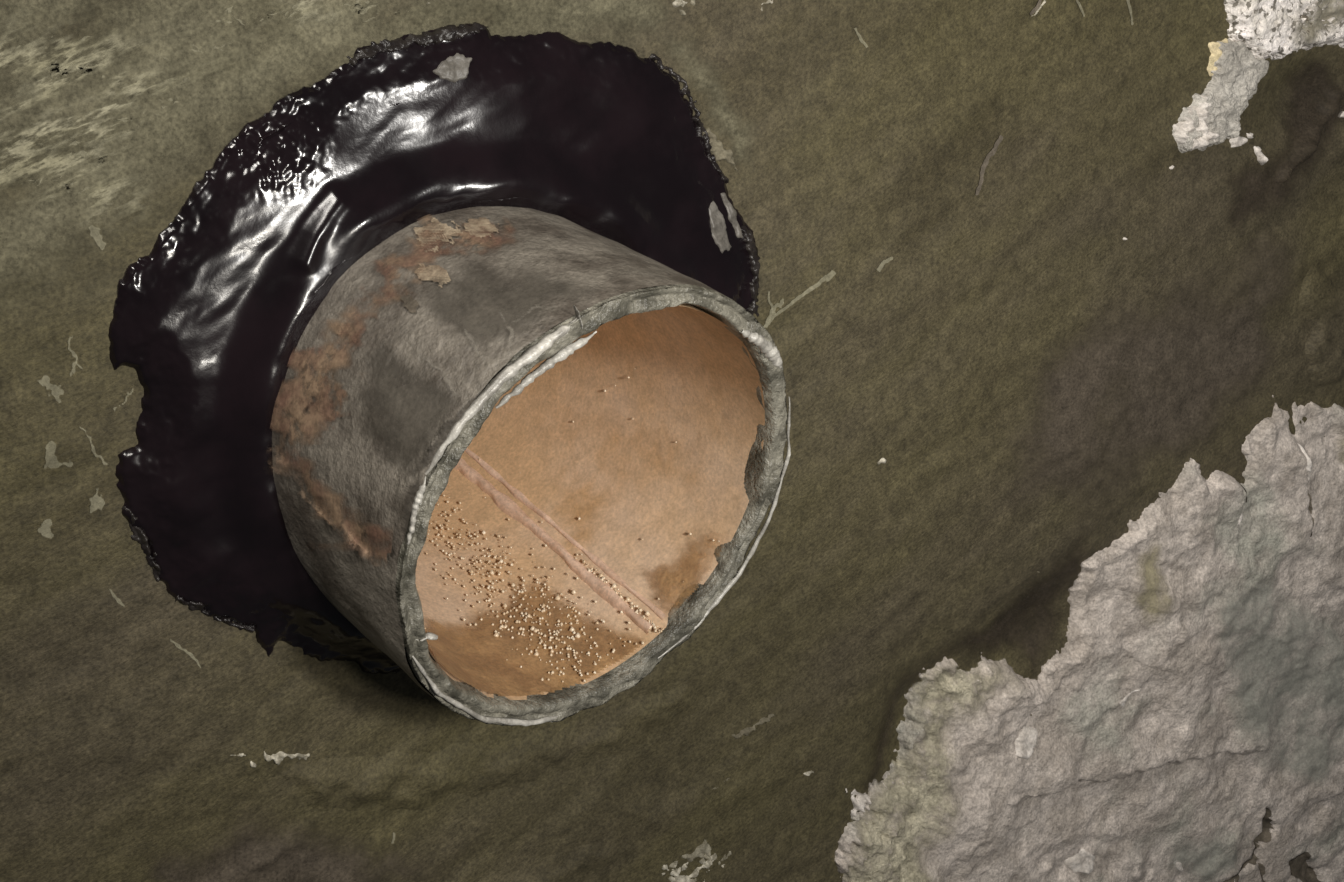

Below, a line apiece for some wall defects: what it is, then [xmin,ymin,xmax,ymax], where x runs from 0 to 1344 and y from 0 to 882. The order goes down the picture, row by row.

spalling [1169,0,1344,170]
corrosion [270,233,450,560]
crack [1307,493,1315,537]
spalling [835,395,1344,882]
peeling [732,714,774,739]
crack [1224,842,1265,882]